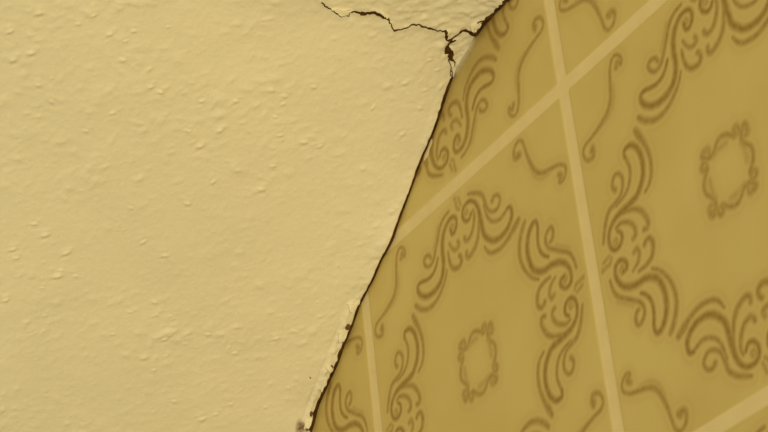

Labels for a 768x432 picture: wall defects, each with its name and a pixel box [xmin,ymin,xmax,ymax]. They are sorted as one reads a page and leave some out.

peeling [338,324,350,345]
crack [309,0,510,432]